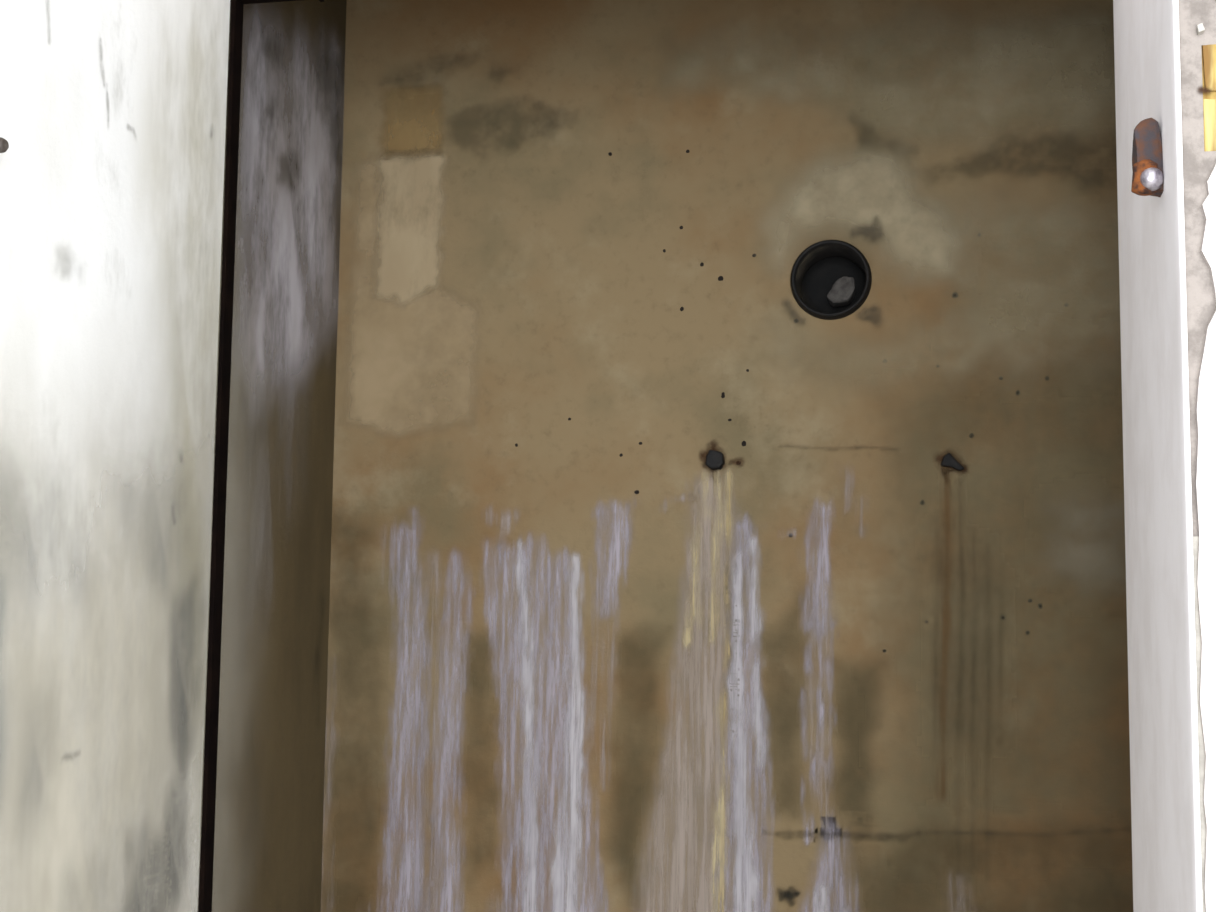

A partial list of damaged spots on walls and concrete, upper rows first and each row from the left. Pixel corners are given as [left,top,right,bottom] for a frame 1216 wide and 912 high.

leakage [386,529,462,912]
leakage [485,540,606,912]
leakage [604,504,629,609]
leakage [646,471,843,912]
spalling [1178,0,1216,912]